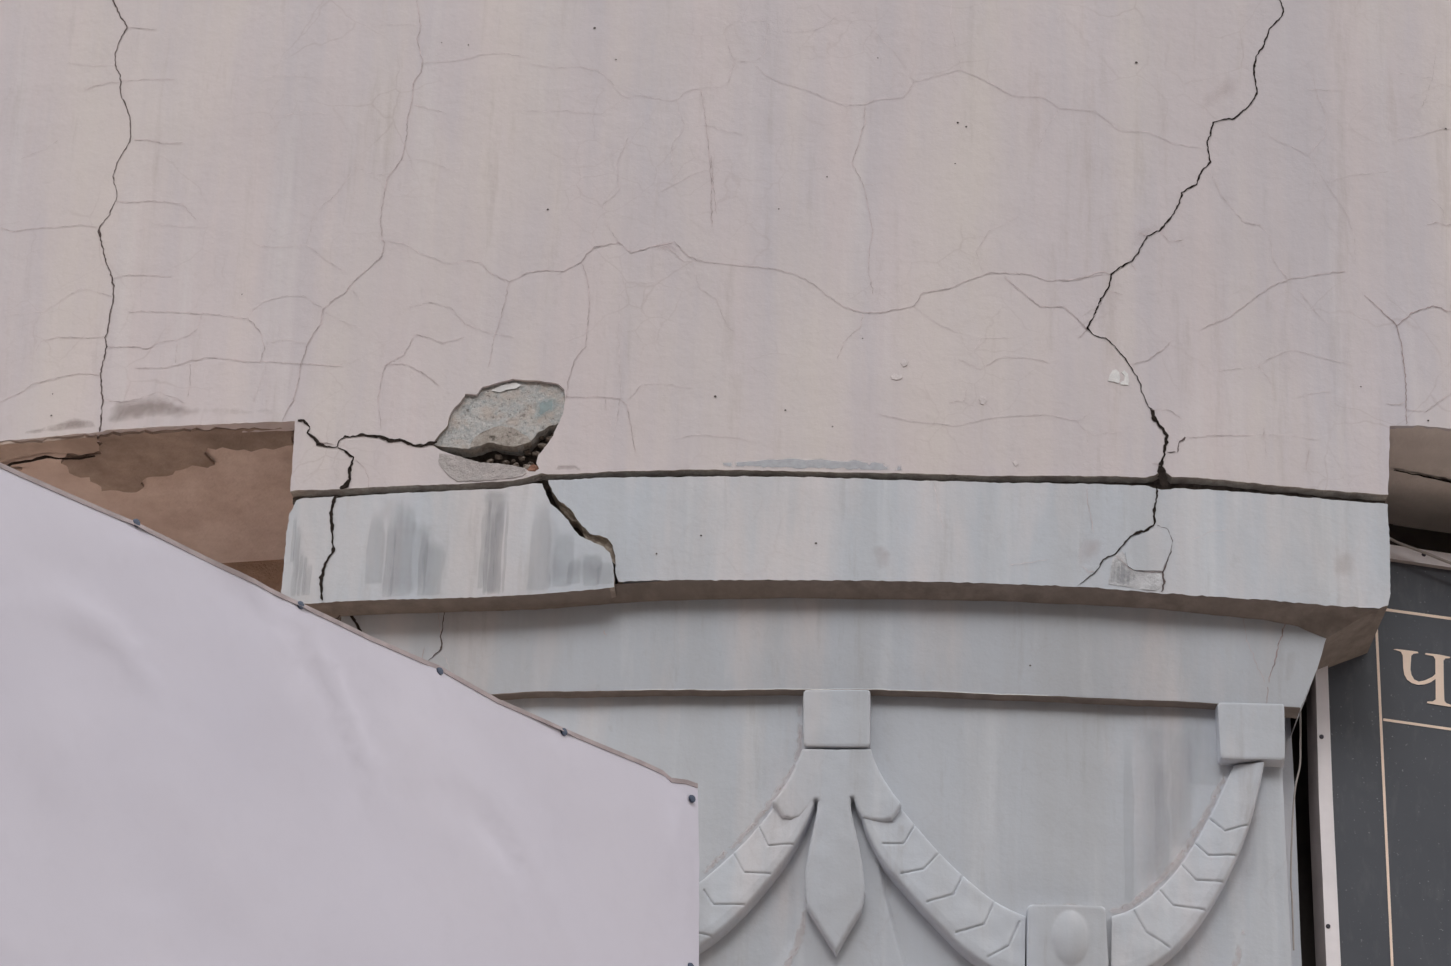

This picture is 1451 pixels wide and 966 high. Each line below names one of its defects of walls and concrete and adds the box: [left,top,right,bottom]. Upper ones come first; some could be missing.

crack [0,0,1451,631]
flaking render [0,427,294,493]
spalling [281,381,616,618]
crack [422,612,450,669]